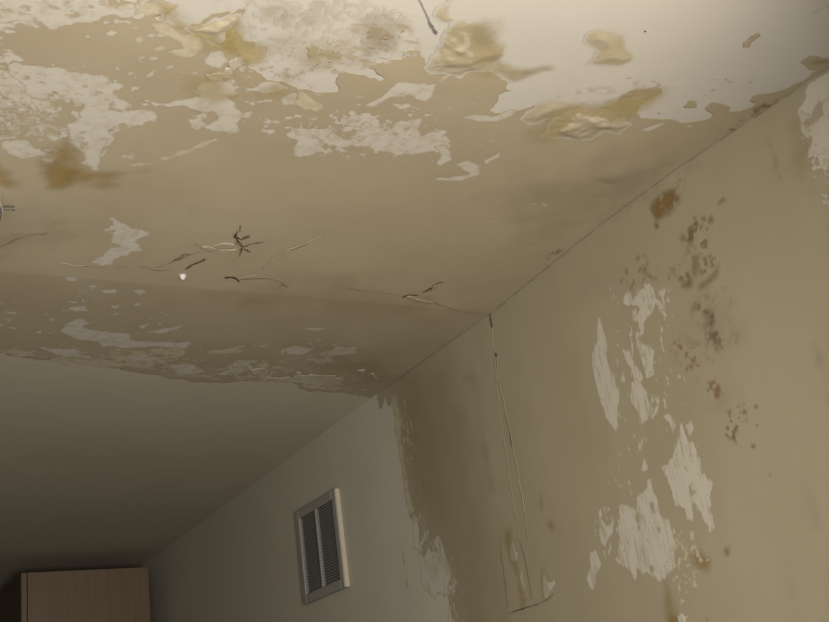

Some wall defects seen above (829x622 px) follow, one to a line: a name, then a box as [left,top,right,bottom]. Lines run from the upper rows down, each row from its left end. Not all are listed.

crack [58,244,206,271]
crack [225,226,332,287]
peeling [0,0,829,398]
crack [421,301,550,613]
peeling [377,68,829,622]